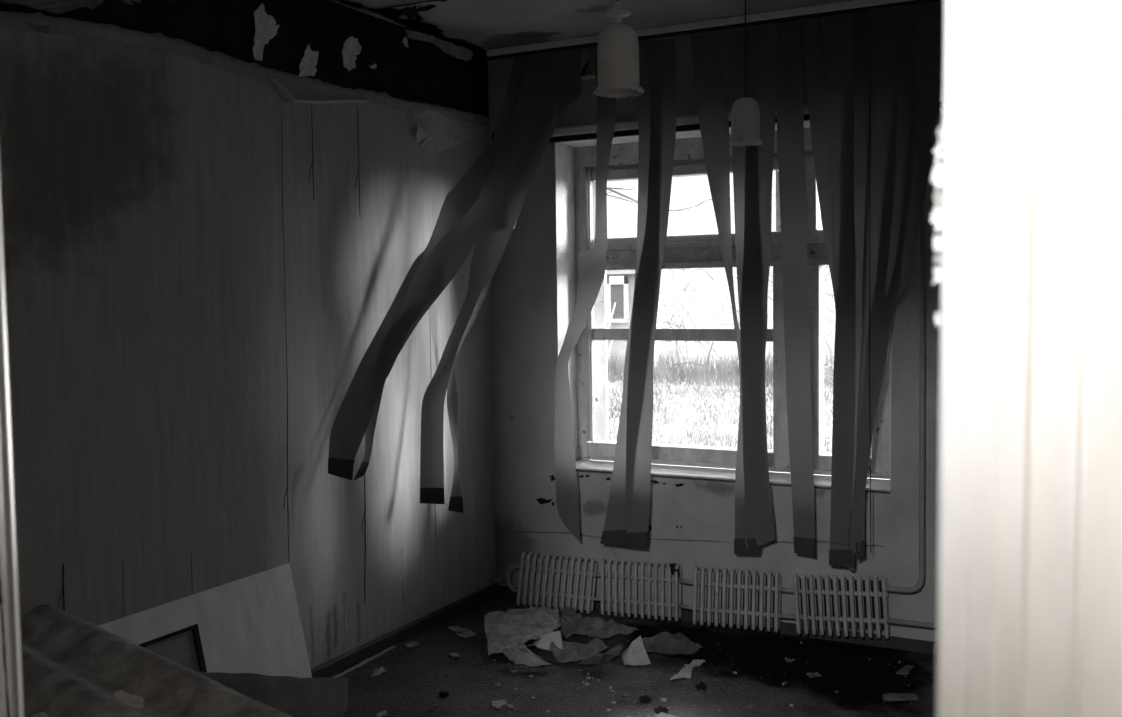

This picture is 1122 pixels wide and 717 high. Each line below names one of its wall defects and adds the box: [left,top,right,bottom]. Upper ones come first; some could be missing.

peeling [0,11,490,154]
peeling [536,496,556,506]
crack [0,580,10,717]